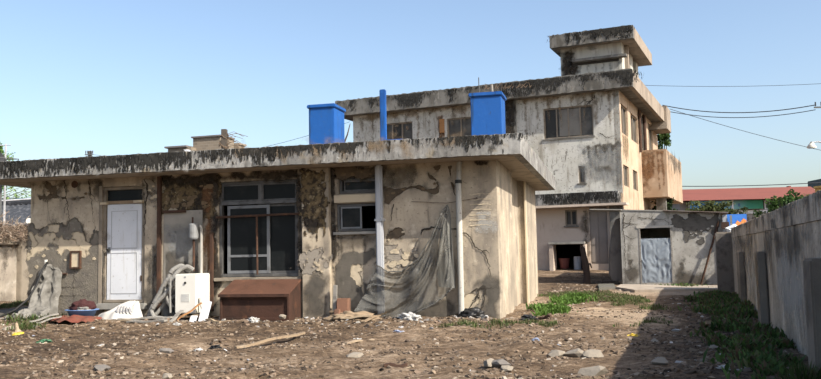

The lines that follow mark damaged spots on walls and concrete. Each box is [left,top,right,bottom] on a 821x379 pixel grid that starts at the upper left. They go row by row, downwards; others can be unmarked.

damp [547,25,635,45]
damp [0,62,644,197]
peeling [140,174,222,219]
peeling [383,165,456,204]
damp [539,191,623,205]
flaking render [25,217,105,317]
damp [142,245,199,314]
peeling [297,247,333,275]
damp [299,167,376,316]
peeling [384,227,419,268]
crack [421,226,496,310]
flaking render [671,212,720,245]